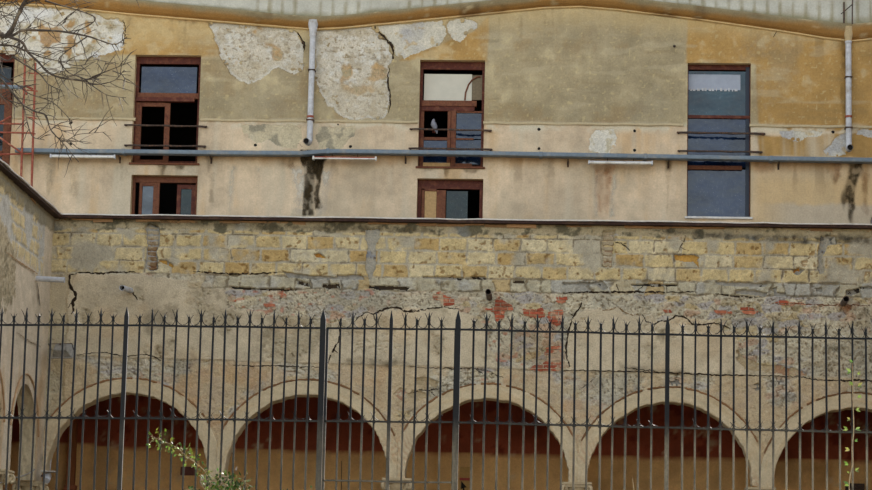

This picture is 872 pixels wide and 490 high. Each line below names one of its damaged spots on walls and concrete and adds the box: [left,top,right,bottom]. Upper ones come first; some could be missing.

peeling [0,5,124,75]
peeling [209,22,304,84]
peeling [314,18,477,149]
peeling [589,129,617,153]
peeling [823,133,848,156]
damp [294,150,329,216]
damp [842,164,862,219]
crack [68,271,138,314]
flaking render [482,296,568,326]
flaking render [530,342,569,371]